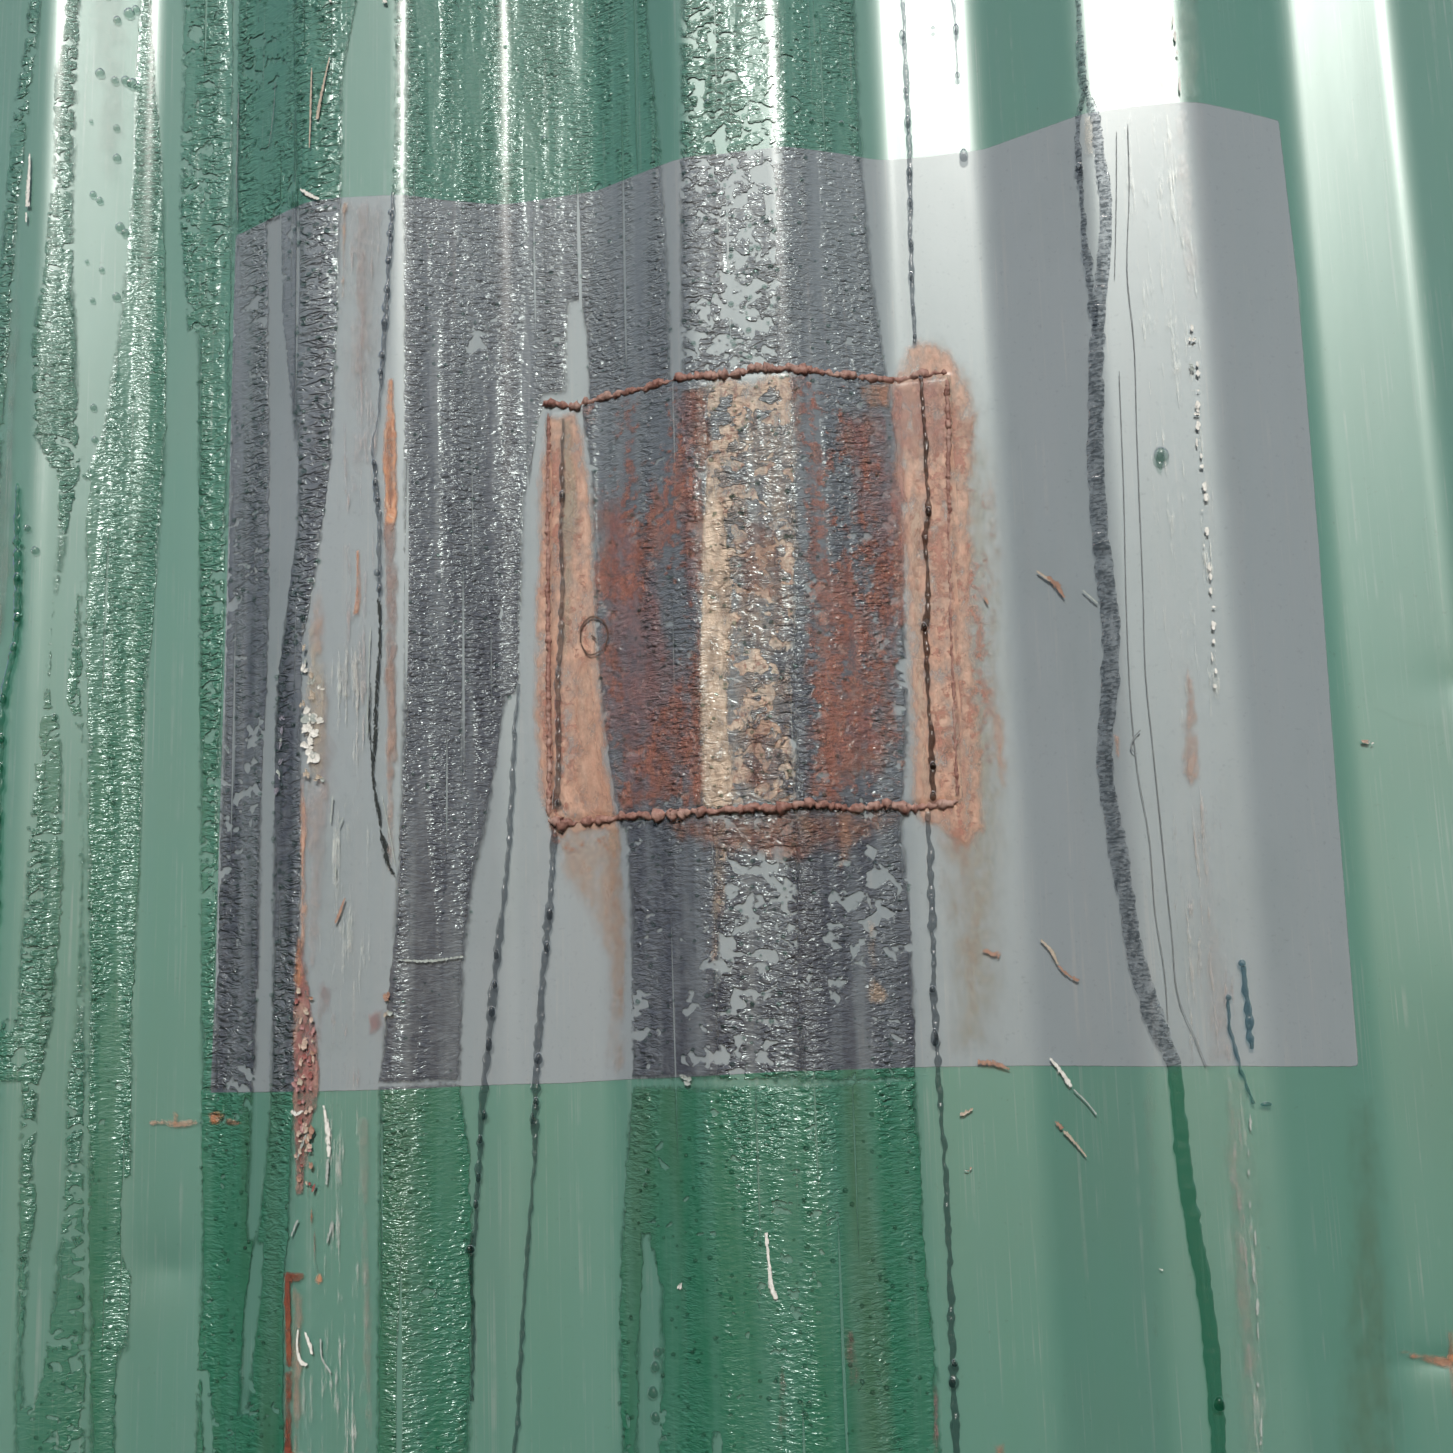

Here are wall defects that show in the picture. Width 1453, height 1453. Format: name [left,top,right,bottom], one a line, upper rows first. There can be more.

peeling [274,644,325,795]
rust [383,379,397,752]
rust [535,345,1001,860]
rust [293,798,319,1193]
rust [284,1272,322,1453]
rust [1411,1350,1453,1366]